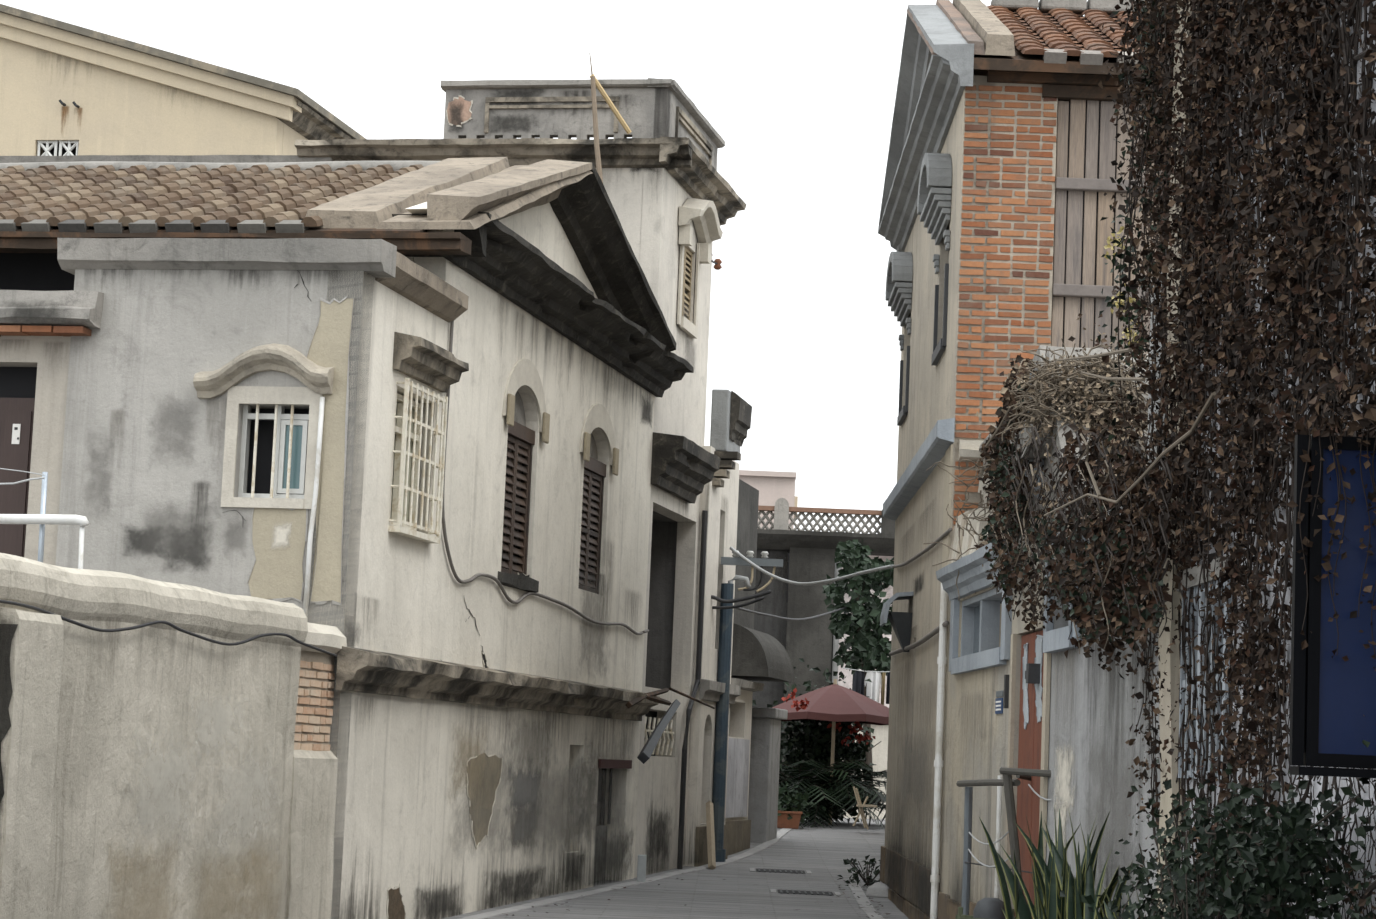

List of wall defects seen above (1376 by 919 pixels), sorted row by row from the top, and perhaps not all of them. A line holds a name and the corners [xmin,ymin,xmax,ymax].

flaking render [446,95,473,128]
damp [128,528,204,567]
damp [0,622,18,803]
flaking render [466,750,541,849]
damp [348,893,372,919]
flaking render [386,884,406,919]
damp [421,890,456,919]